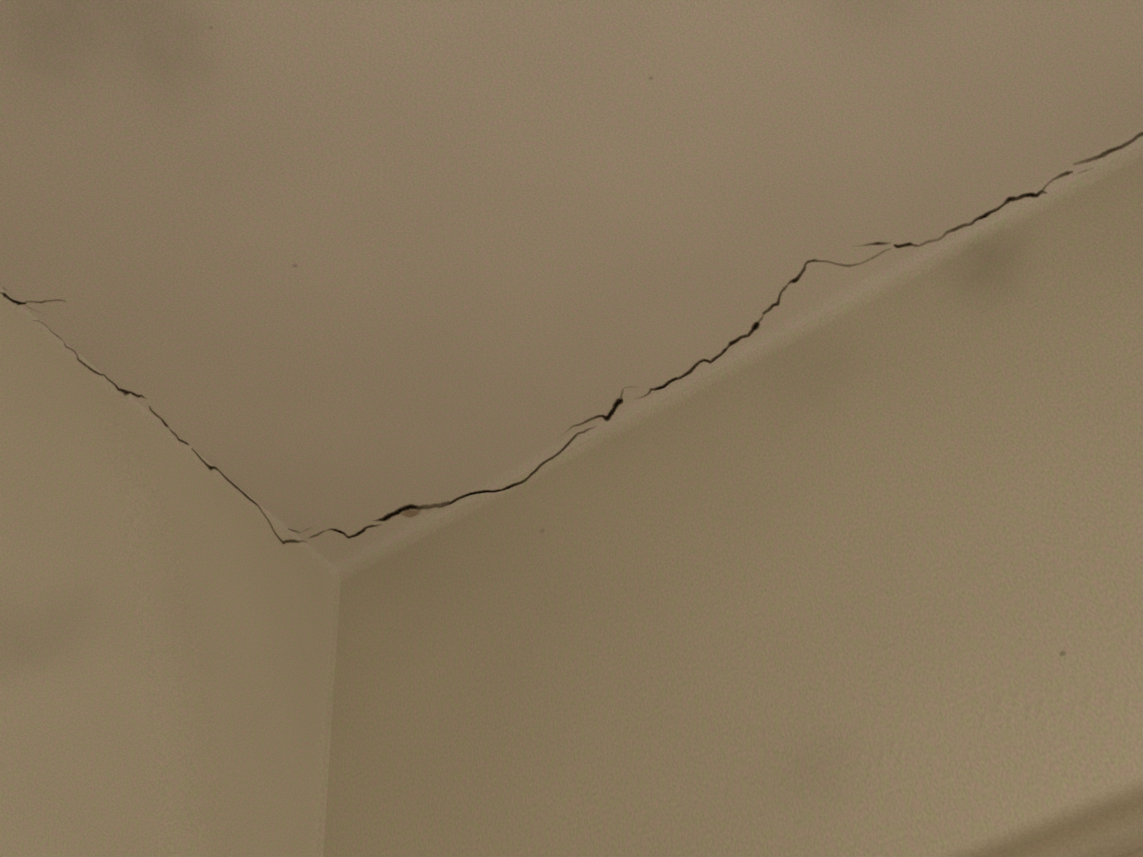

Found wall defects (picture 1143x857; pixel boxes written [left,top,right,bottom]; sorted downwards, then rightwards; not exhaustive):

crack [2,293,43,305]
crack [649,259,817,393]
crack [873,241,917,249]
crack [948,133,1143,233]
crack [71,349,258,505]
crack [331,399,623,538]